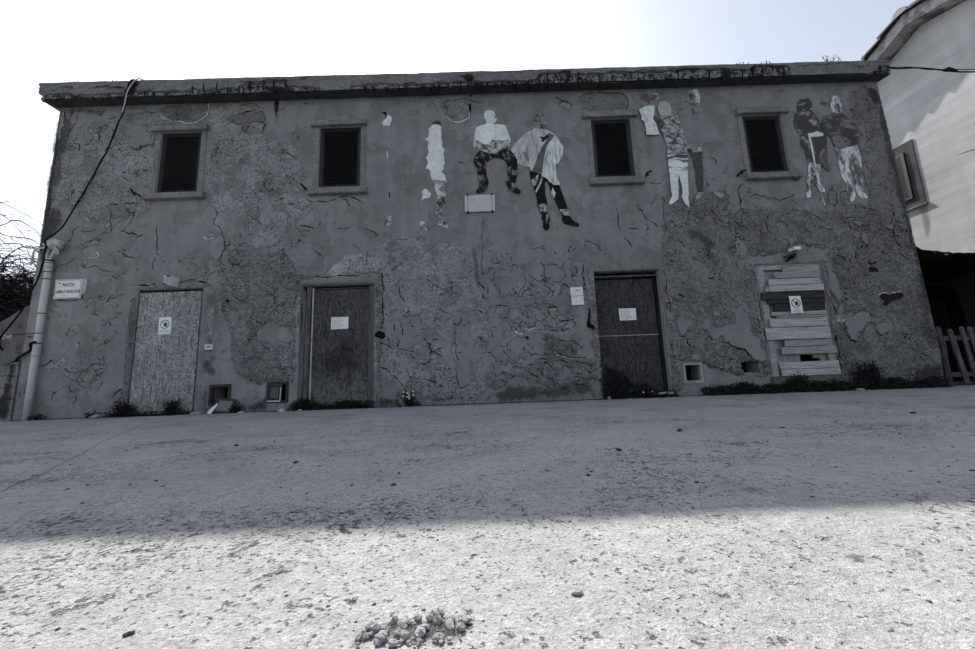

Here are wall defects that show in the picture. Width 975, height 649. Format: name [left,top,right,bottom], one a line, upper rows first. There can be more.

crack [211,79,298,156]
crack [610,68,677,109]
crack [53,197,265,325]
crack [255,149,601,389]
peeling [39,65,890,406]
crack [616,169,908,369]
peeling [660,89,944,393]